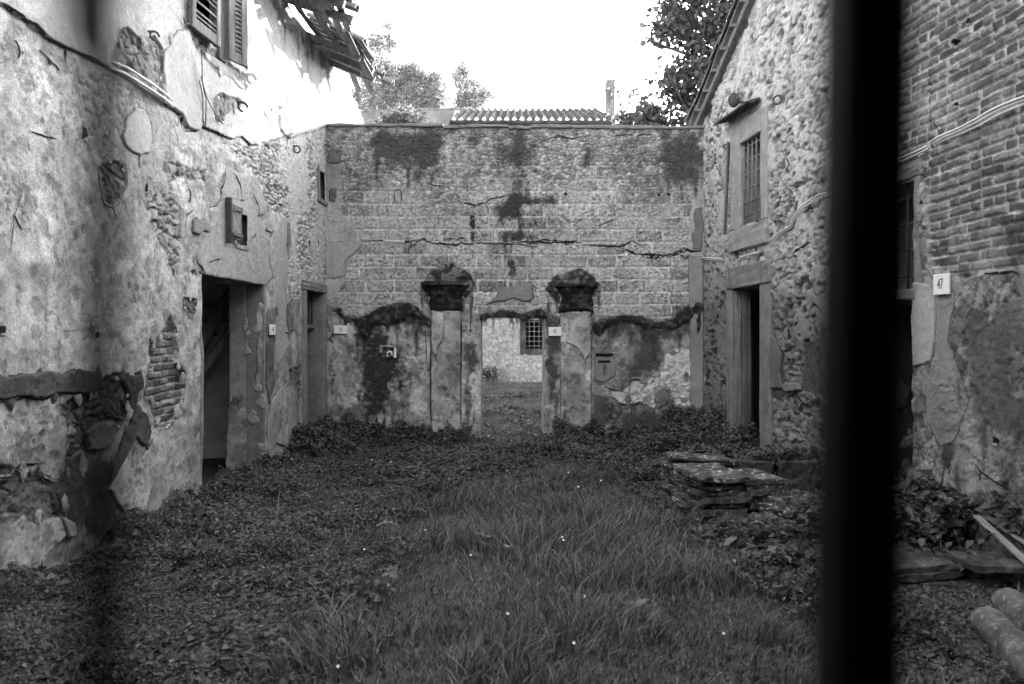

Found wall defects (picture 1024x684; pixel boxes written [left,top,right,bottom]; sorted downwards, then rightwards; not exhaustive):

leakage [370,131,444,186]
leakage [495,132,554,252]
crack [362,219,702,259]
leakage [659,132,703,195]
flaking render [126,296,198,457]
leakage [341,317,425,424]
flaking render [0,367,77,539]
flaking render [907,428,938,473]